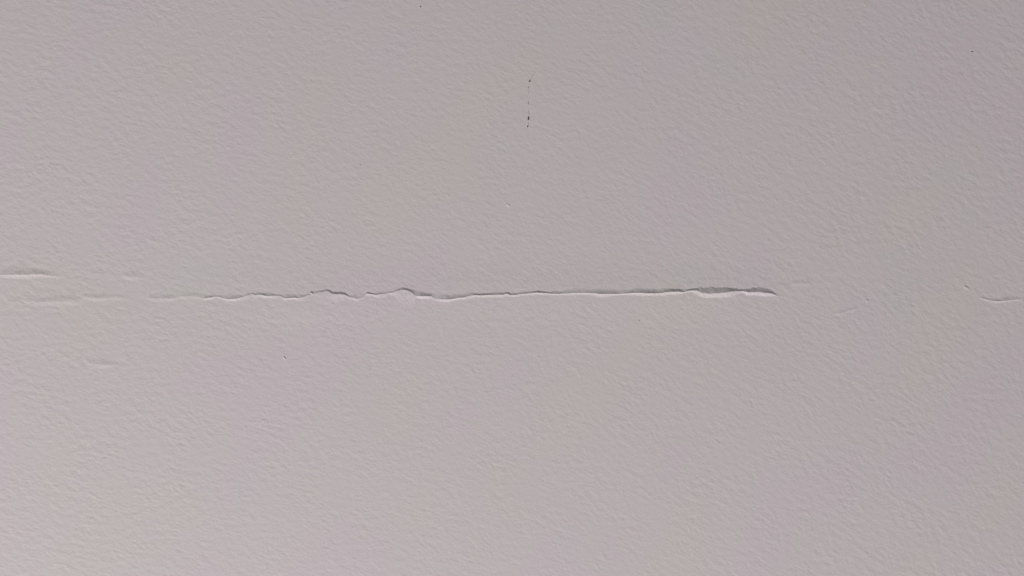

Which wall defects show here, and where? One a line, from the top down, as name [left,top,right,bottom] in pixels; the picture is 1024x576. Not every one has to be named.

crack [145,279,813,305]